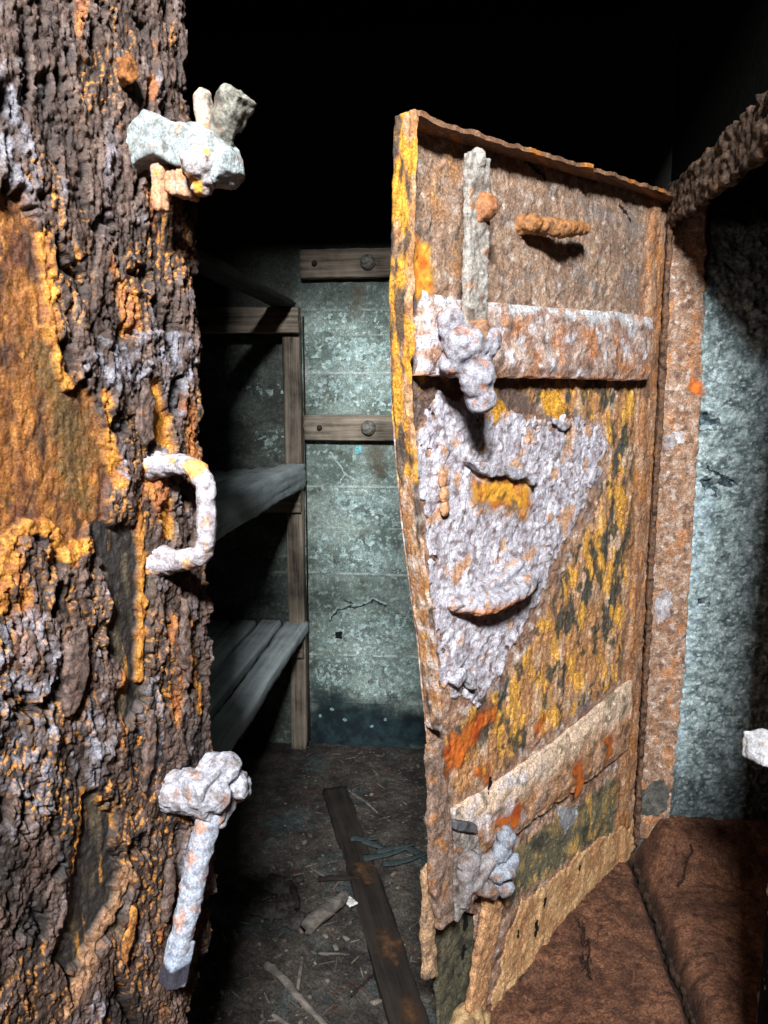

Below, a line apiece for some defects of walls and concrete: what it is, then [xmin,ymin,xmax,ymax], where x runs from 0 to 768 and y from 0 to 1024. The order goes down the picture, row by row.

rust [413,238,434,299]
rust [688,378,704,395]
rust [471,476,530,519]
crack [329,597,387,622]
water stain [309,691,427,749]
rust [443,707,496,785]
rust [573,758,584,798]
rust [496,803,521,829]